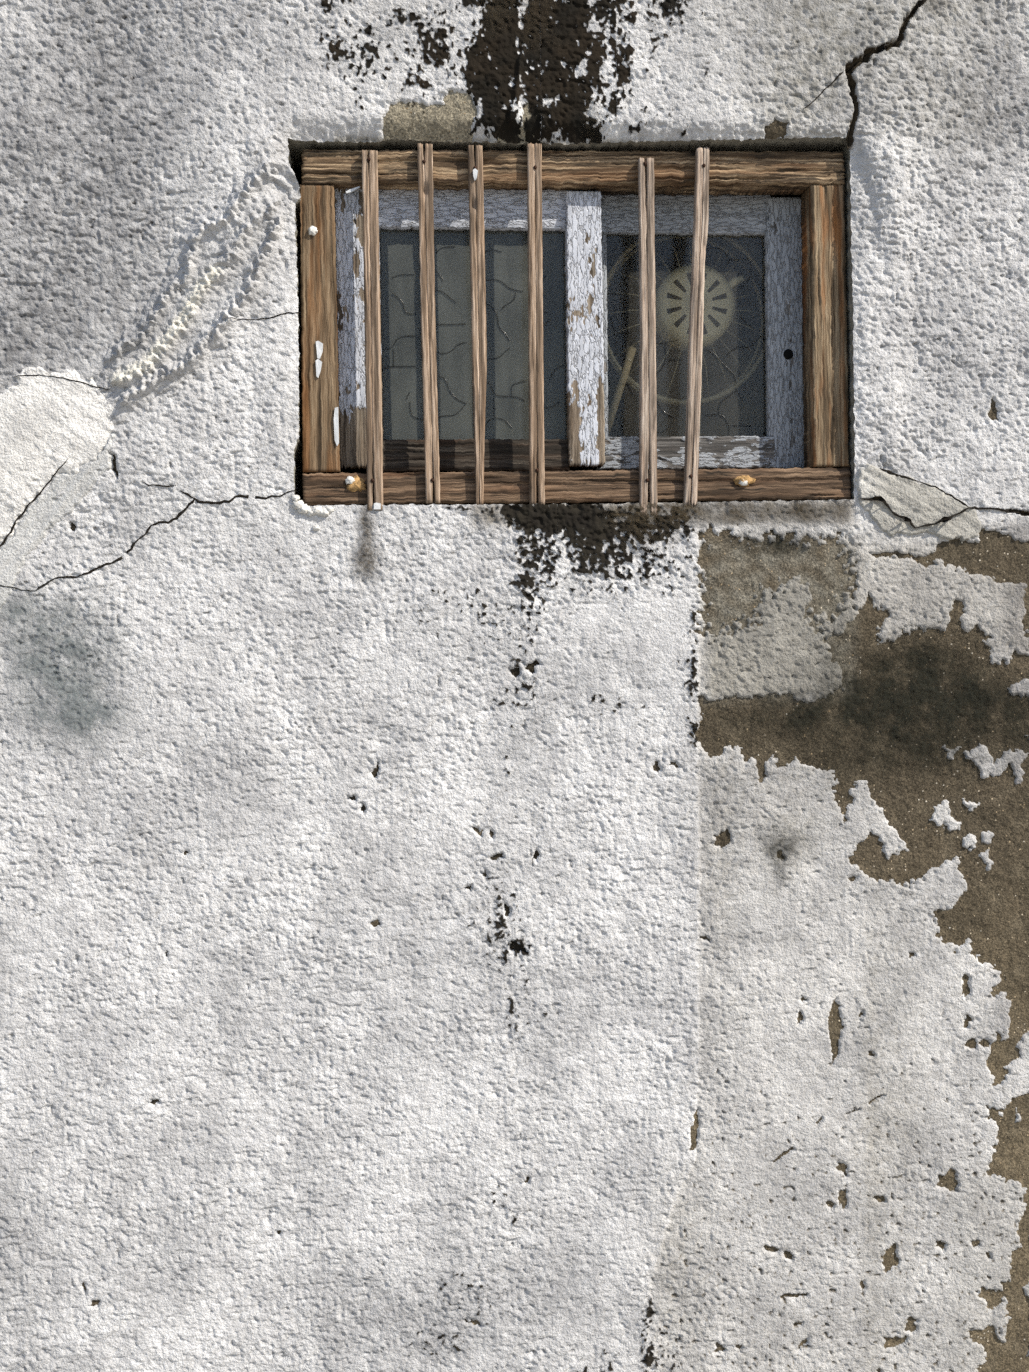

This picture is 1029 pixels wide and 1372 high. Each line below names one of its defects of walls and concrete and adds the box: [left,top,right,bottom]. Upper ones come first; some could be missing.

damp [309,0,703,144]
crack [803,0,926,148]
crack [0,459,68,547]
crack [0,482,297,592]
crack [860,468,1029,528]
damp [413,502,702,710]
damp [687,716,704,747]
damp [754,641,1029,767]
flaking render [693,524,1029,1086]
peeling [826,1162,847,1209]
peeling [882,1243,899,1273]
flaking render [967,1087,1029,1372]